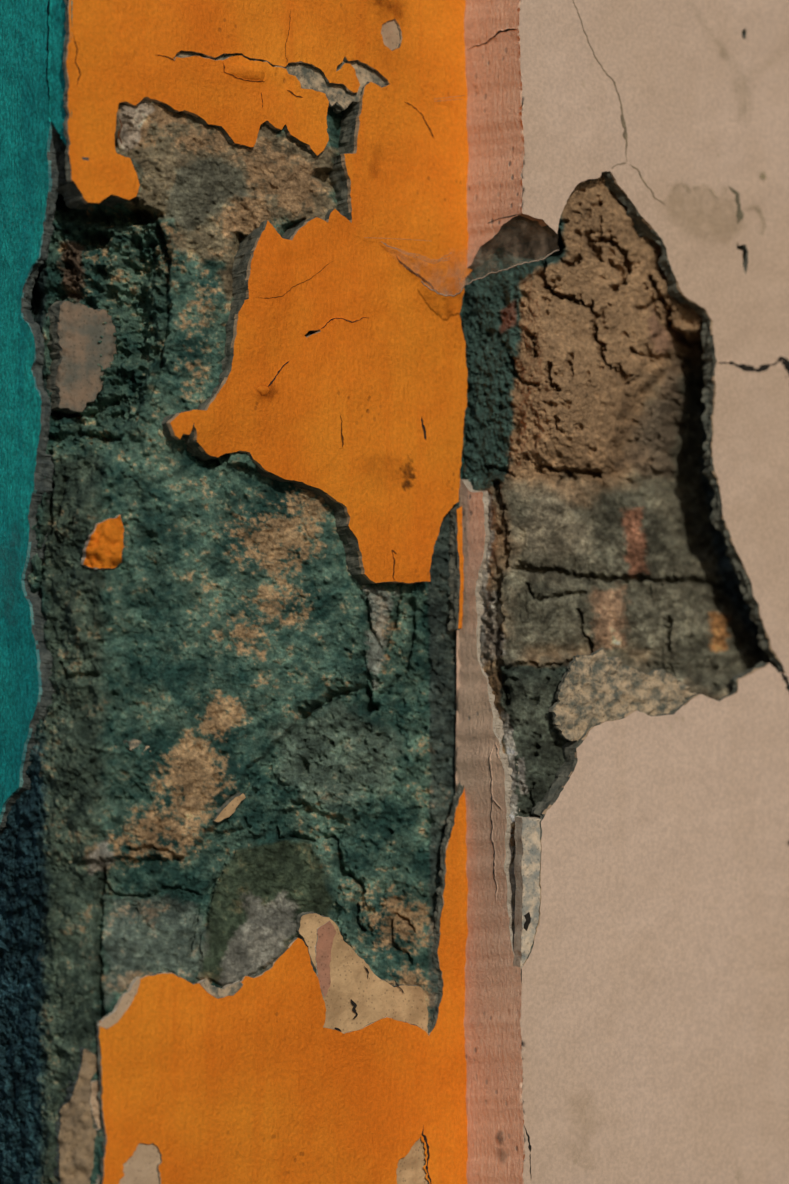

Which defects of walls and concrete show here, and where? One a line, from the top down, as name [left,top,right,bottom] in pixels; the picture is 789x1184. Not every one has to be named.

peeling [381,20,400,51]
crack [468,27,517,50]
crack [156,53,175,61]
flaking render [175,52,235,60]
crack [573,0,663,203]
crack [714,353,789,387]
flaking render [459,175,778,969]
flaking render [0,61,460,1184]